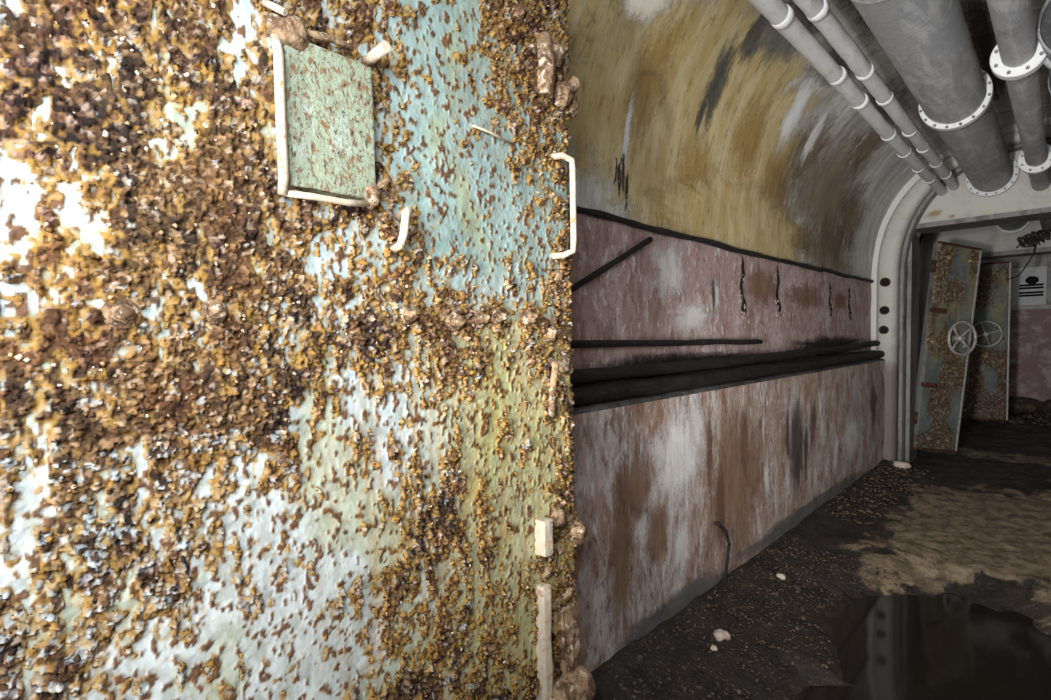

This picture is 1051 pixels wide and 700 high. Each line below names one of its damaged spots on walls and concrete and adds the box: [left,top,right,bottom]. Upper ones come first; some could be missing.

damp [565,0,881,275]
damp [869,93,890,120]
rust [0,0,578,700]
damp [653,245,720,331]
damp [624,398,730,645]
damp [744,403,861,555]